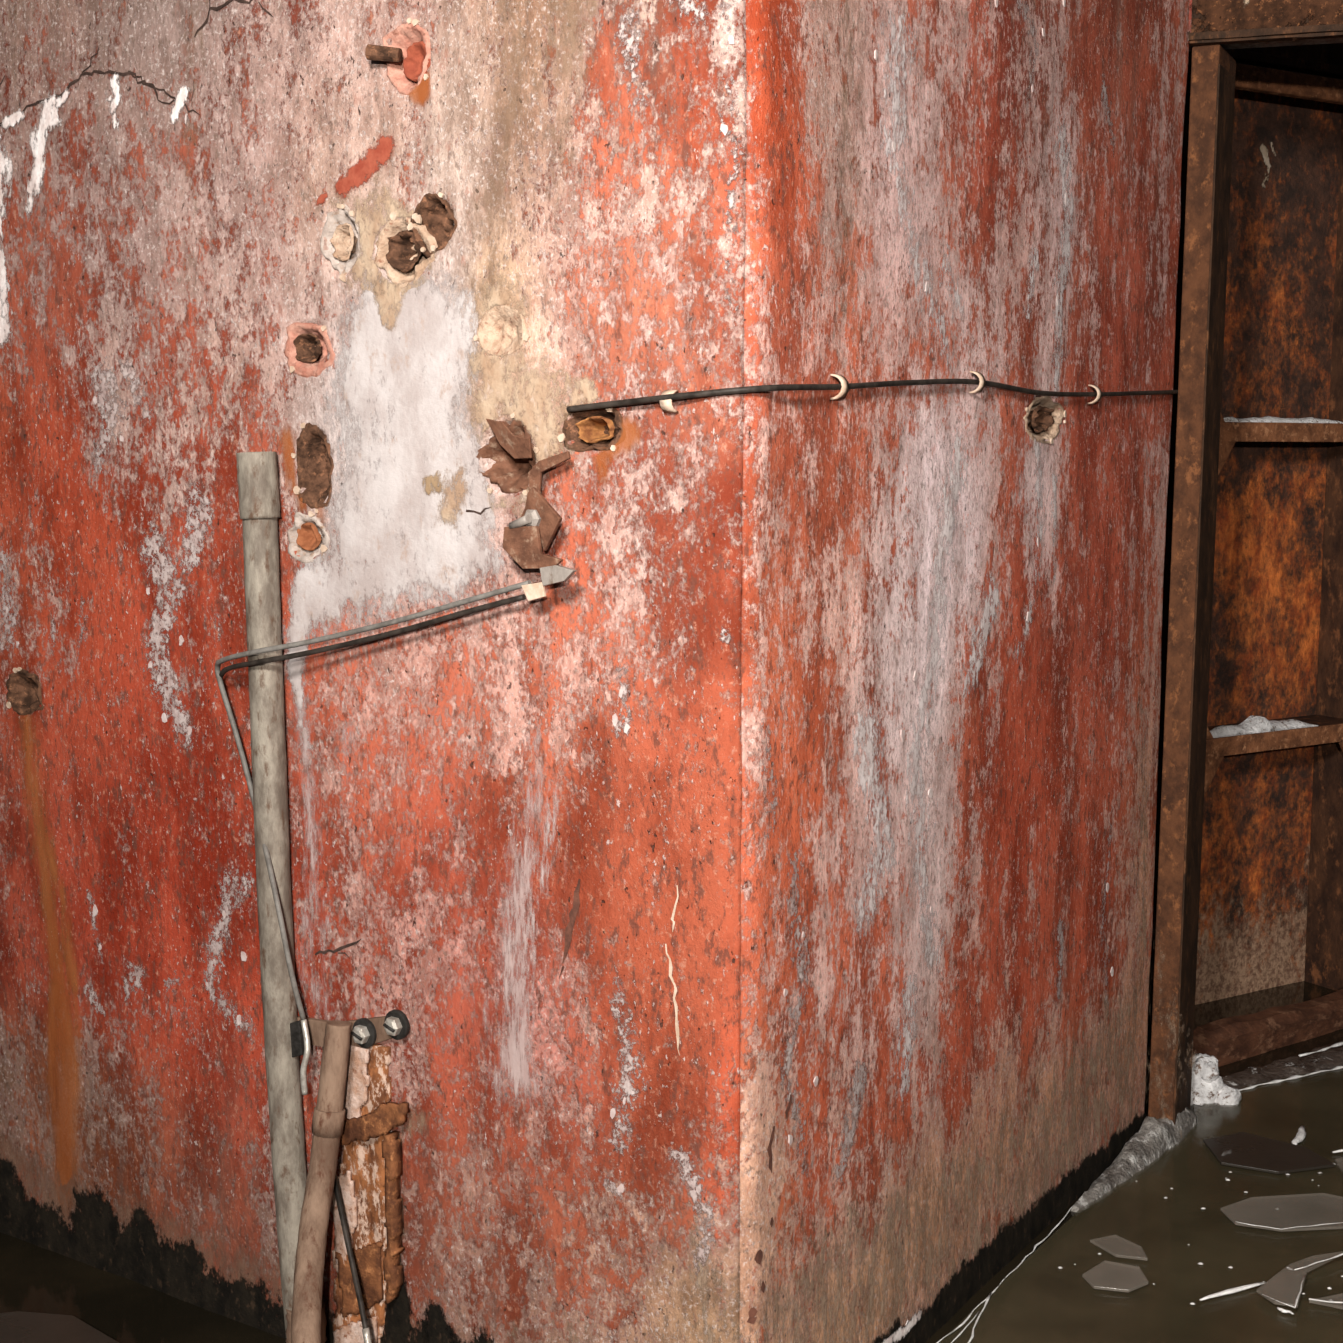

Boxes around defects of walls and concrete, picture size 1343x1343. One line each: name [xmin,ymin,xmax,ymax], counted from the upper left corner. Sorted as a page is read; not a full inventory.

crack [0,47,202,126]
water stain [105,74,121,130]
water stain [169,86,190,124]
crack [194,0,273,37]
spalling [365,18,431,95]
water stain [0,89,70,347]
corrosion [283,431,303,508]
peeling [281,192,539,749]
water stain [764,880,1164,1343]
water stain [0,1133,286,1339]
water stain [325,1307,335,1343]
water stain [380,1258,494,1343]